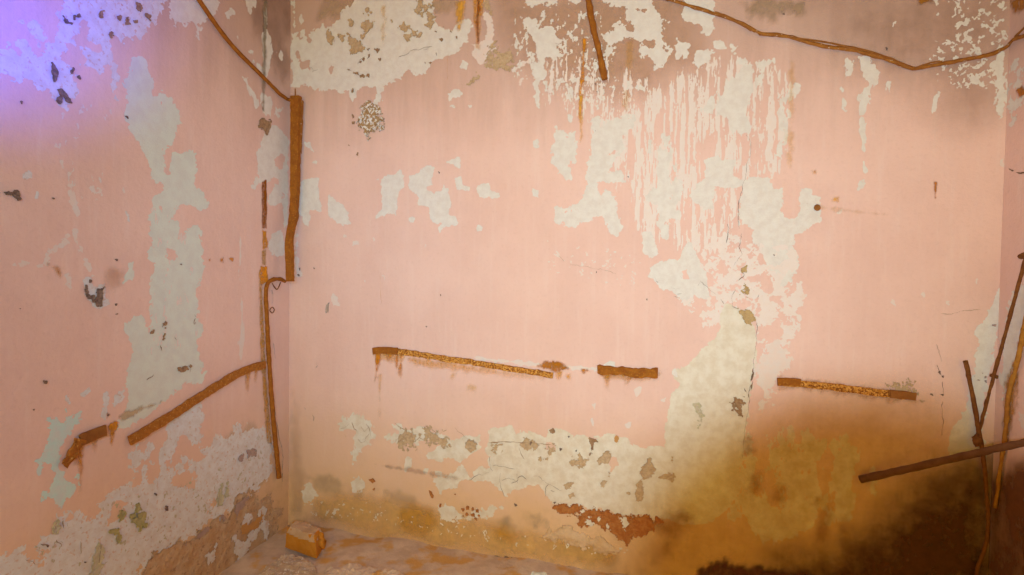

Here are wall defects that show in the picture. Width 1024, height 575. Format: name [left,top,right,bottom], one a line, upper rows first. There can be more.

peeling [929,0,1024,127]
peeling [0,0,283,575]
rust [107,180,271,445]
rust [372,347,569,379]
peeling [242,0,822,553]
rust [582,364,658,379]
rust [777,378,917,401]
leakage [319,499,609,560]
leakage [698,465,1024,575]